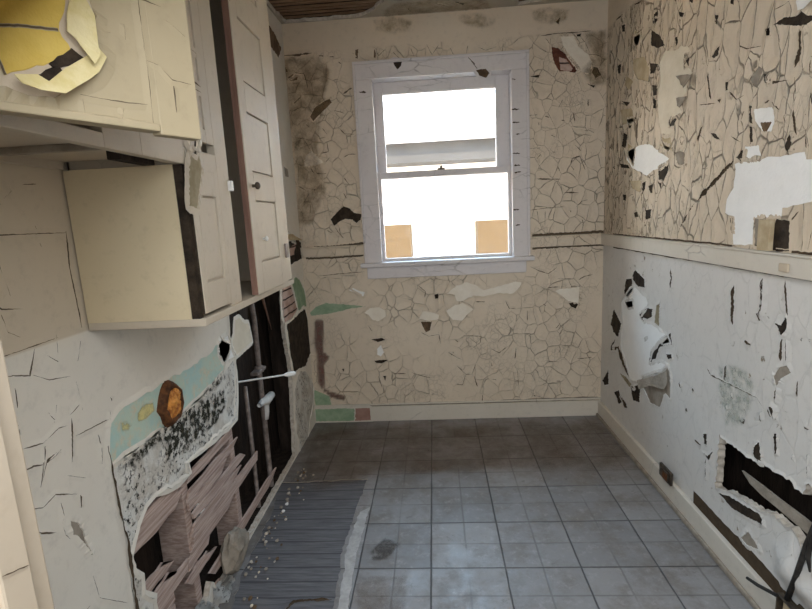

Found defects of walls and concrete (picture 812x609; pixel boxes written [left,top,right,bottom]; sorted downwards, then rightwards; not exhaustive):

crack [0,23,59,32]
peeling [0,0,117,110]
peeling [183,113,205,216]
crack [511,24,812,351]
crack [0,227,139,609]
corrosion [168,386,181,419]
leakage [126,376,225,466]
peeling [105,228,391,609]
peeling [602,267,674,410]
crack [677,337,802,423]
flaking render [701,404,812,555]
crack [693,486,804,609]